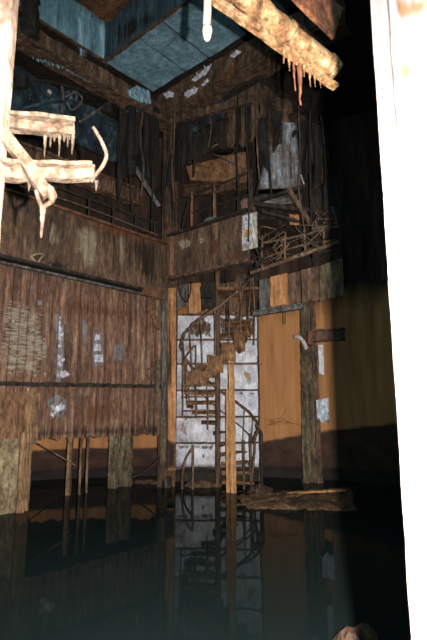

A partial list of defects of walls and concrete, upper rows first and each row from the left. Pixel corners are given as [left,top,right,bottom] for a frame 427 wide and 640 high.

peeling [54,315,69,382]
peeling [48,394,66,421]